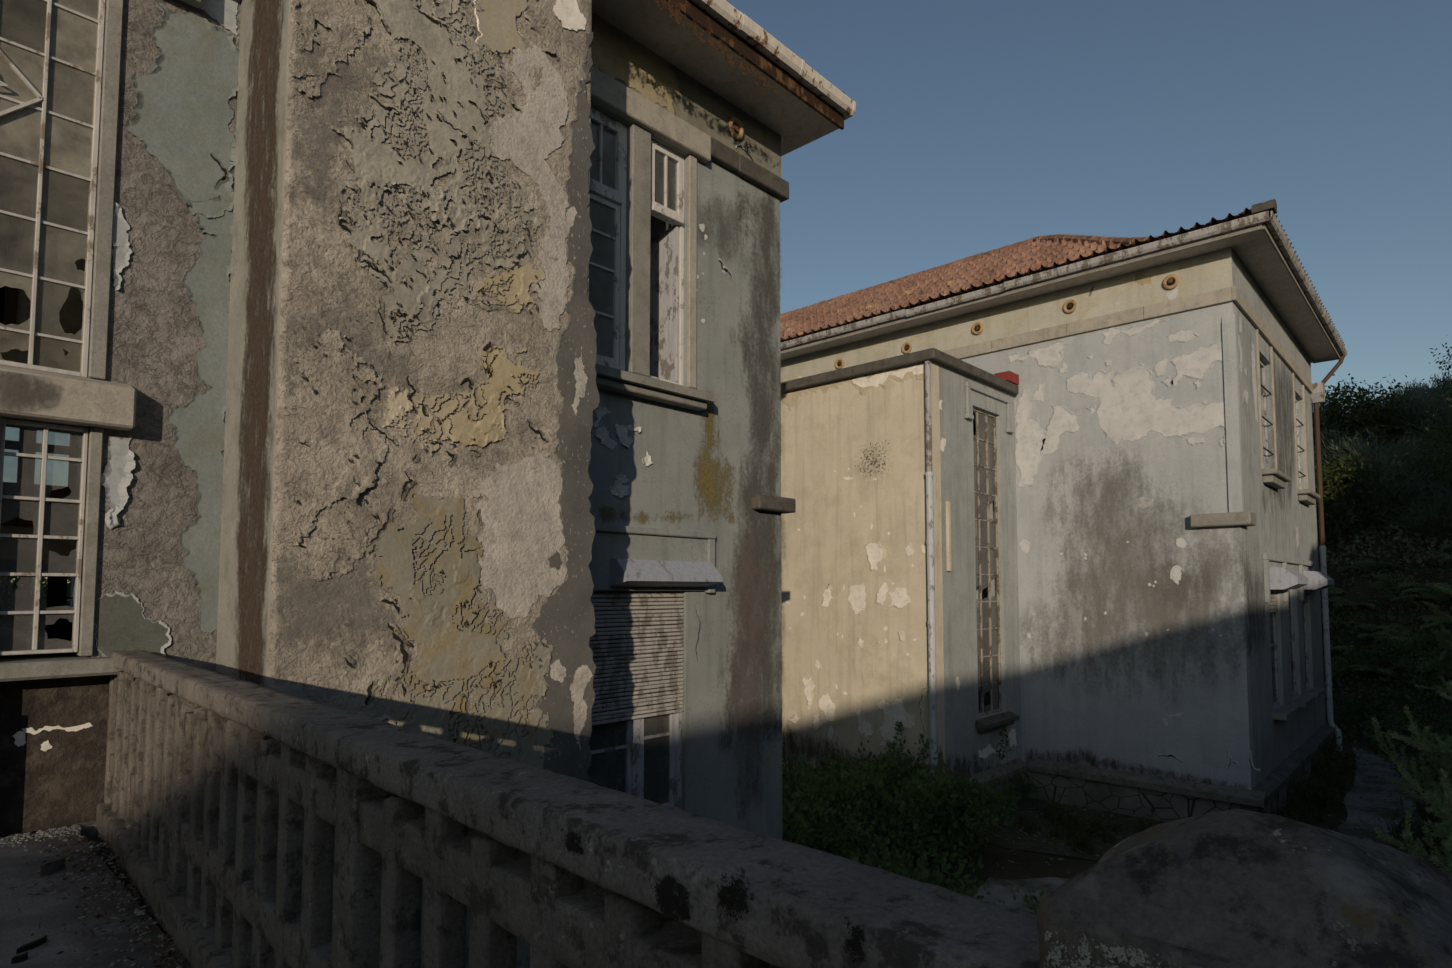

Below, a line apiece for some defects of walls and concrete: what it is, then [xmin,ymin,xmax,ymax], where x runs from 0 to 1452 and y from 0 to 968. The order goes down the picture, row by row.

peeling [112,203,132,291]
peeling [123,0,241,634]
peeling [286,0,681,782]
peeling [1008,289,1258,488]
peeling [101,435,136,530]
damp [694,193,886,799]
damp [853,440,892,479]
peeling [784,505,911,630]
damp [1047,470,1229,675]
peeling [12,723,92,751]
peeling [788,659,847,730]
peeling [877,695,917,746]